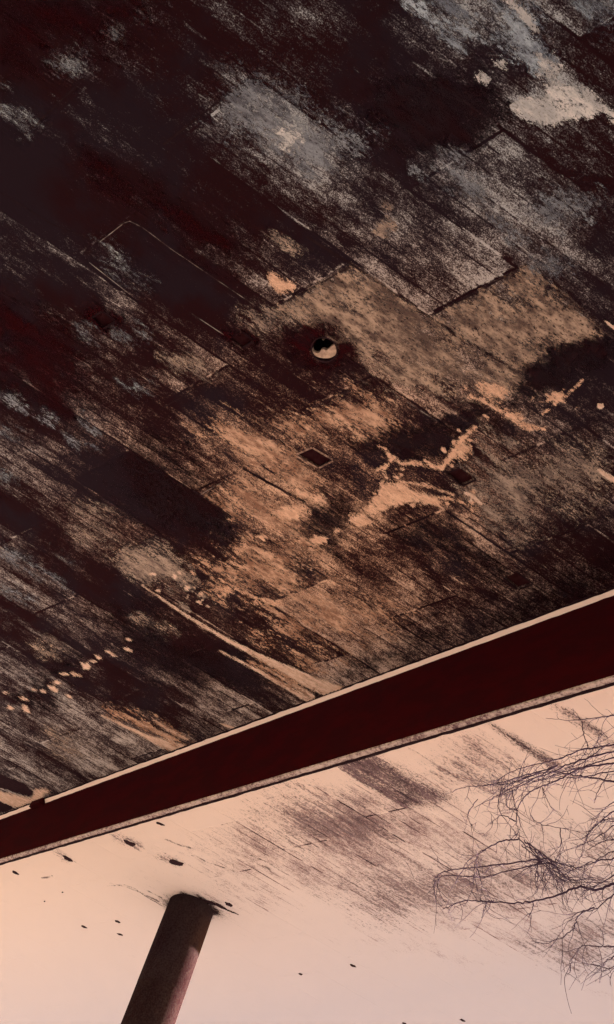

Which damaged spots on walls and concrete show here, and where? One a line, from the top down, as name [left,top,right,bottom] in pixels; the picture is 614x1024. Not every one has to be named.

damp [102,430,240,556]
peeling [2,634,133,714]